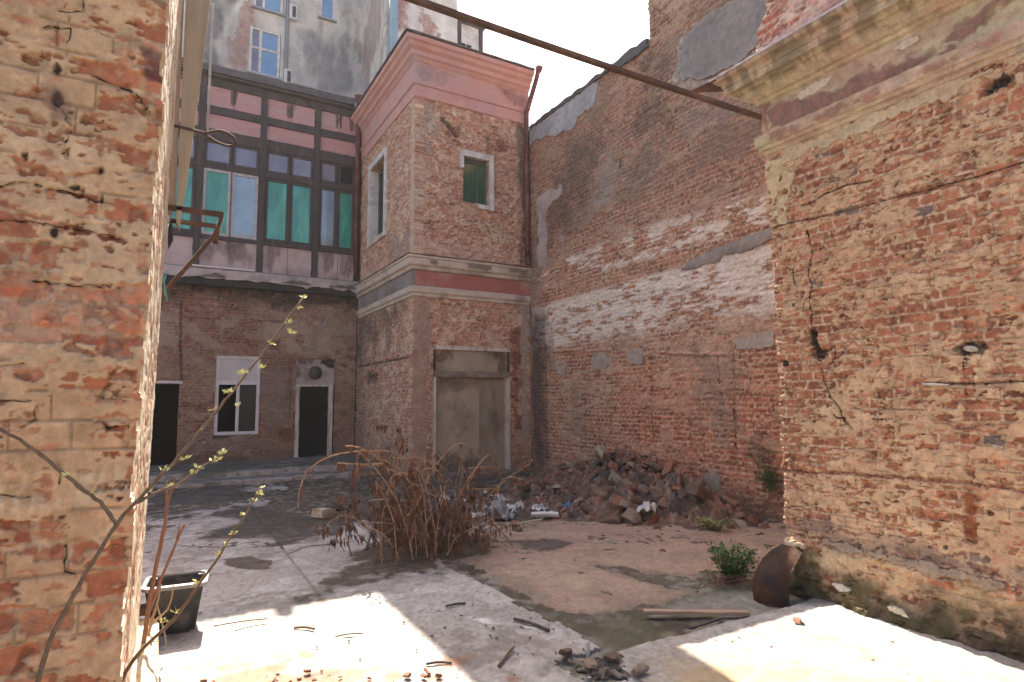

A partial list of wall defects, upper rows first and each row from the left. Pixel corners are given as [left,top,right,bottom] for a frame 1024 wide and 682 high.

crack [43,0,84,43]
peeling [761,0,1011,140]
crack [95,76,150,113]
crack [0,181,103,203]
crack [0,218,114,239]
crack [31,280,123,289]
crack [772,162,1024,436]
flaking render [735,330,775,350]